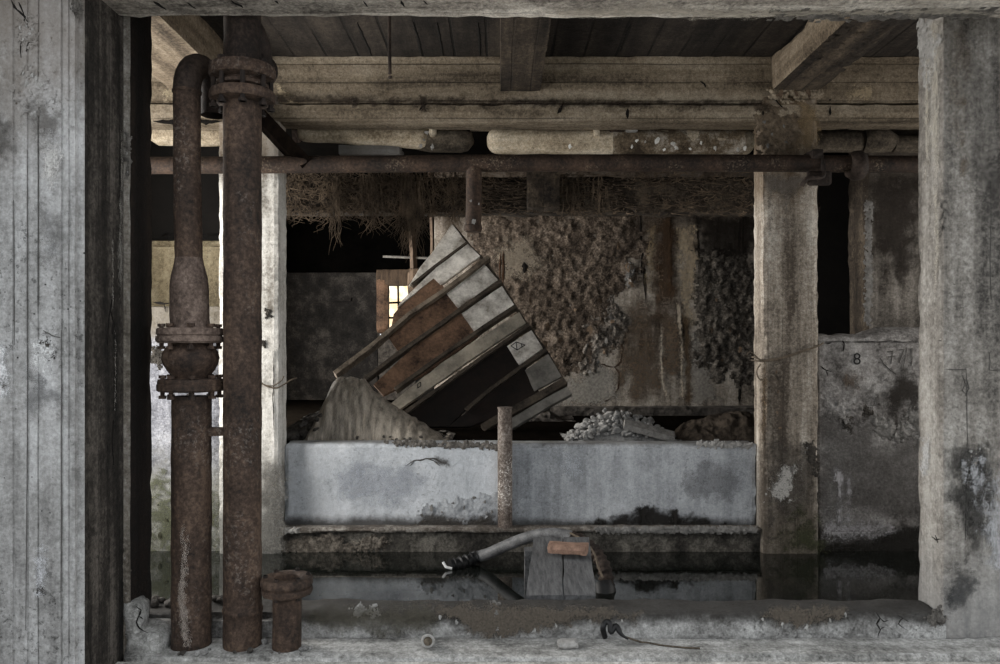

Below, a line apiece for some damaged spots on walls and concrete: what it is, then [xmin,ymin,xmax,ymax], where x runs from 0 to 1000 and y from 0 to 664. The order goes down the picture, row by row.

peeling [467,215,654,377]
rust [649,218,692,403]
water stain [843,364,919,435]
water stain [594,464,803,540]
water stain [945,443,1000,568]